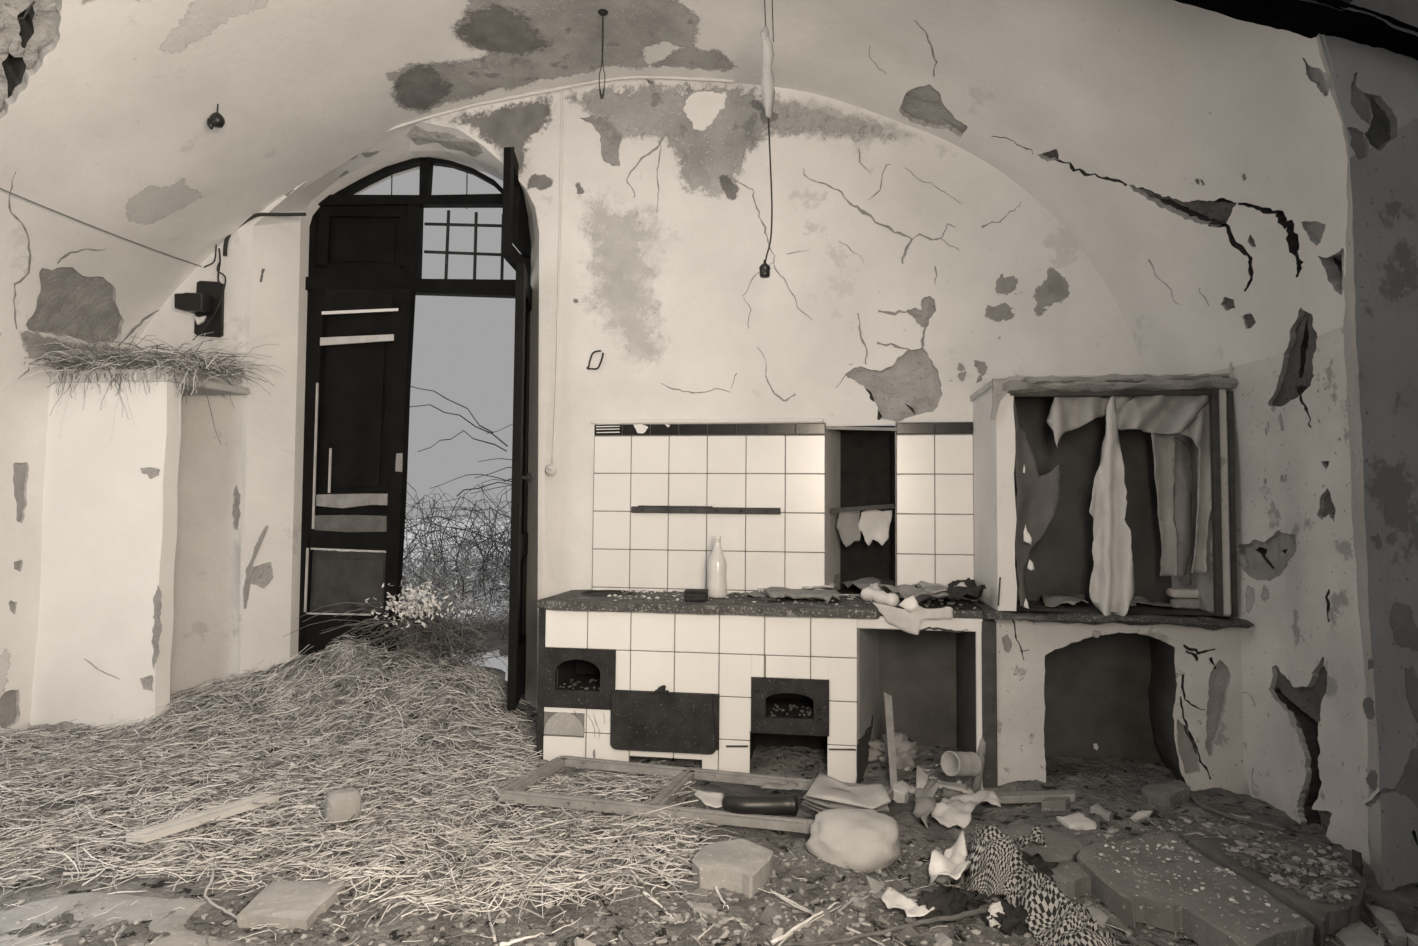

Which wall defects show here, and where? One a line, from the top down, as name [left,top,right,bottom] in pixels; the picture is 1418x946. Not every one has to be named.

flaking render [0,0,62,119]
flaking render [899,84,967,137]
flaking render [1303,58,1398,160]
crack [991,136,1127,187]
flaking render [26,267,124,344]
crack [803,148,1021,388]
crack [1148,259,1209,306]
crack [1208,202,1303,292]
flaking render [846,348,1026,422]
flaking render [1268,307,1317,407]
flaking render [13,462,29,523]
flaking render [1269,657,1332,832]